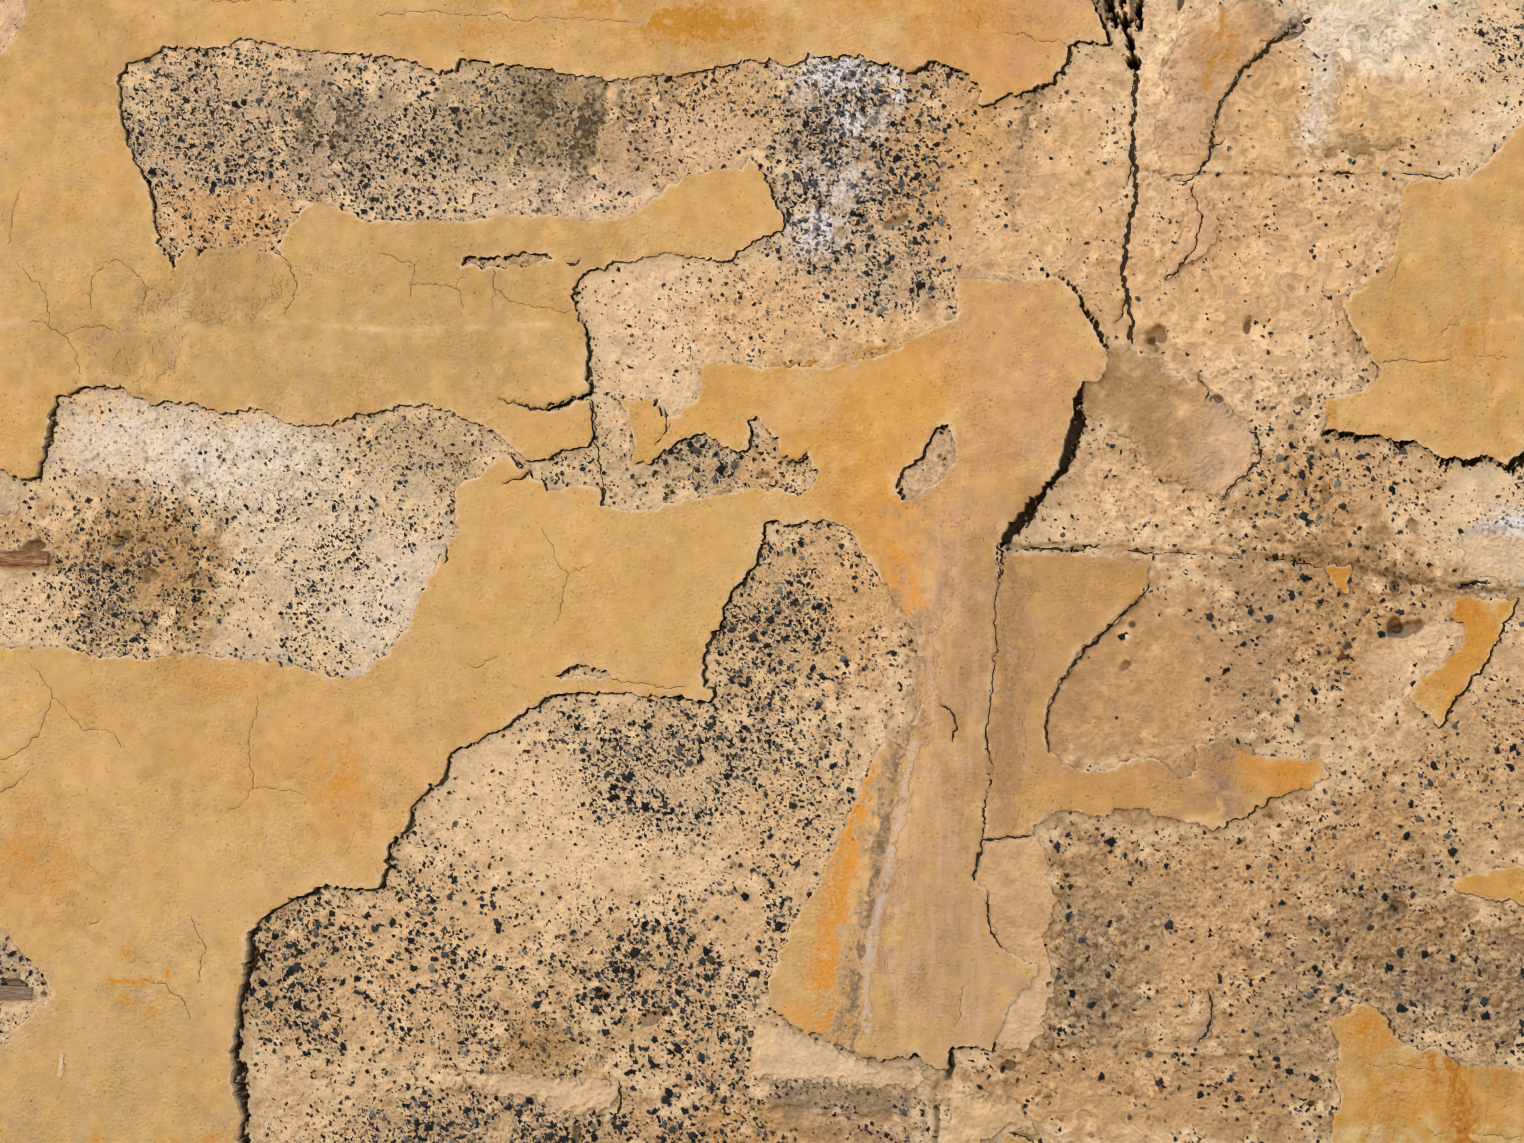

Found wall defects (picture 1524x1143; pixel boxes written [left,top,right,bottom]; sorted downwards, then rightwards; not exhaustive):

crack [976,16,1065,44]
spalling [118,38,558,266]
spalling [1382,179,1396,199]
spalling [463,252,552,270]
spalling [896,425,957,500]
spalling [1279,542,1298,571]
crack [1455,580,1491,589]
spalling [558,664,609,679]
spalling [1264,743,1524,943]
spalling [0,926,52,1047]
spalling [1042,1031,1059,1050]
flaking render [1475,1072,1524,1143]